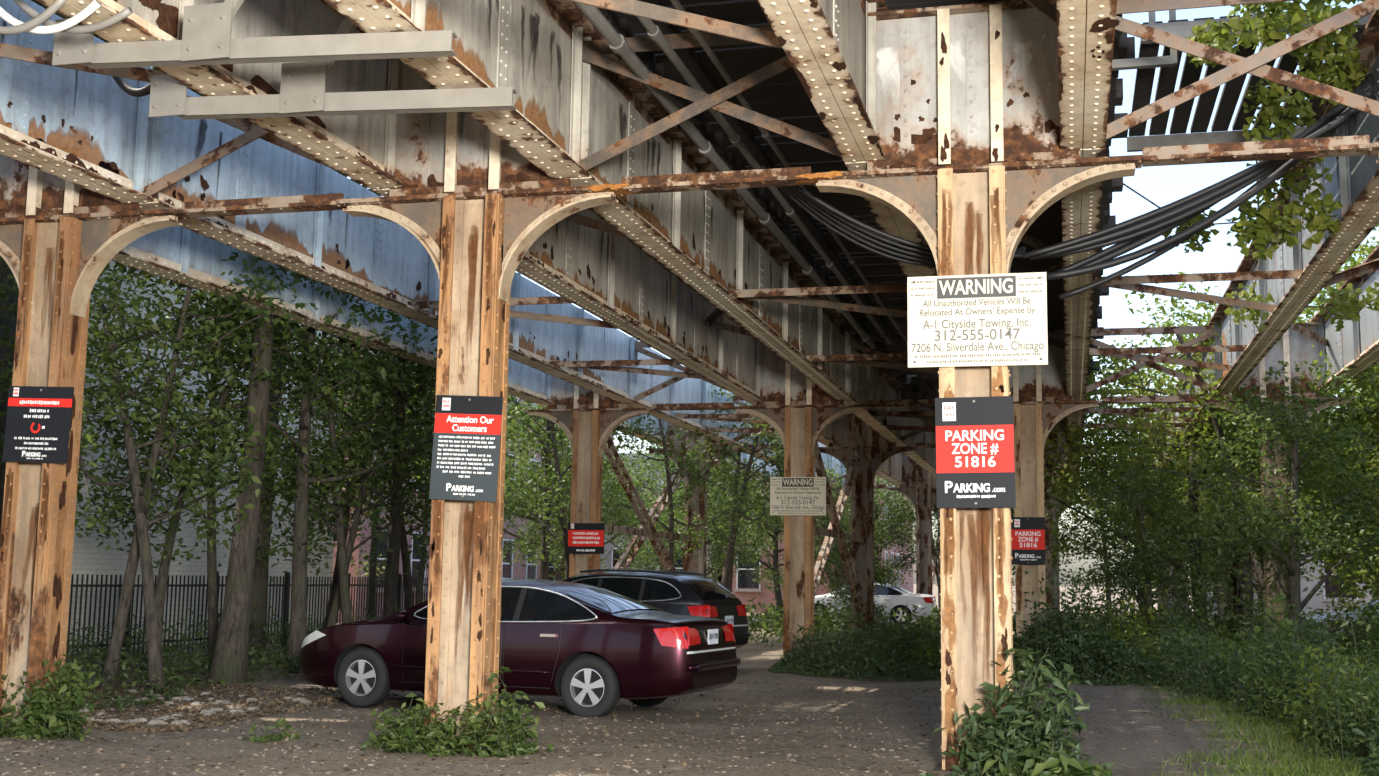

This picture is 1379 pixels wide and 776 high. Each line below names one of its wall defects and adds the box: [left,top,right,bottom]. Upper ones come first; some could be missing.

peeling [21,115,119,182]
rust [388,0,495,88]
peeling [513,110,592,176]
peeling [790,62,842,155]
peeling [854,96,885,157]
peeling [939,32,947,66]
peeling [940,133,950,162]
rust [1089,0,1121,133]
rust [159,174,444,312]
rust [469,218,504,318]
rust [942,194,1001,275]
rust [944,508,1008,627]